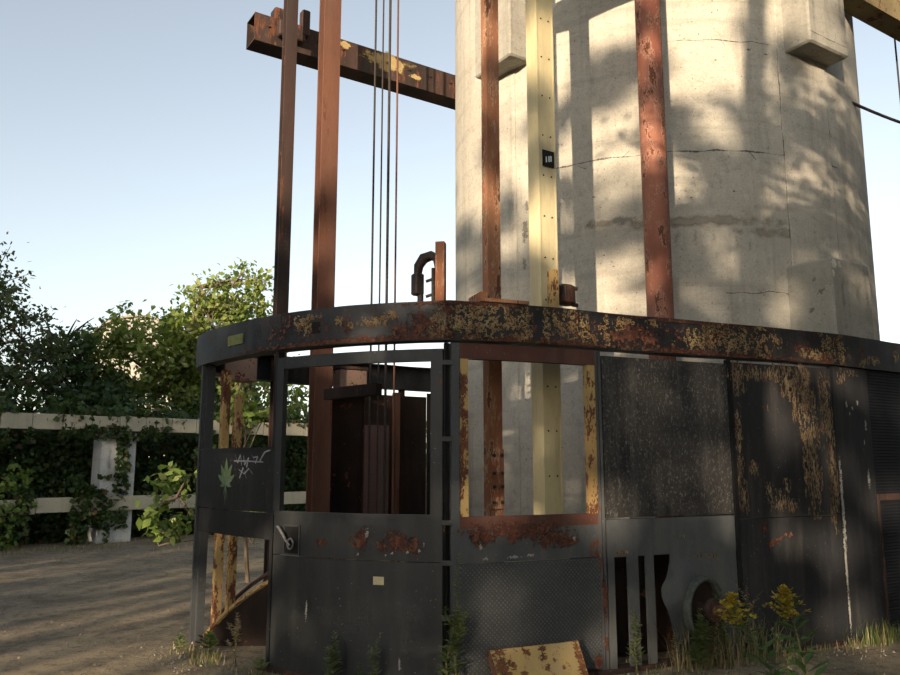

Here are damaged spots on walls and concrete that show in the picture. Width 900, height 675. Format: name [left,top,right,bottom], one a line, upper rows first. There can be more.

peeling [334,310,399,329]
peeling [429,300,658,350]
peeling [671,322,880,639]
rust [443,519,583,550]